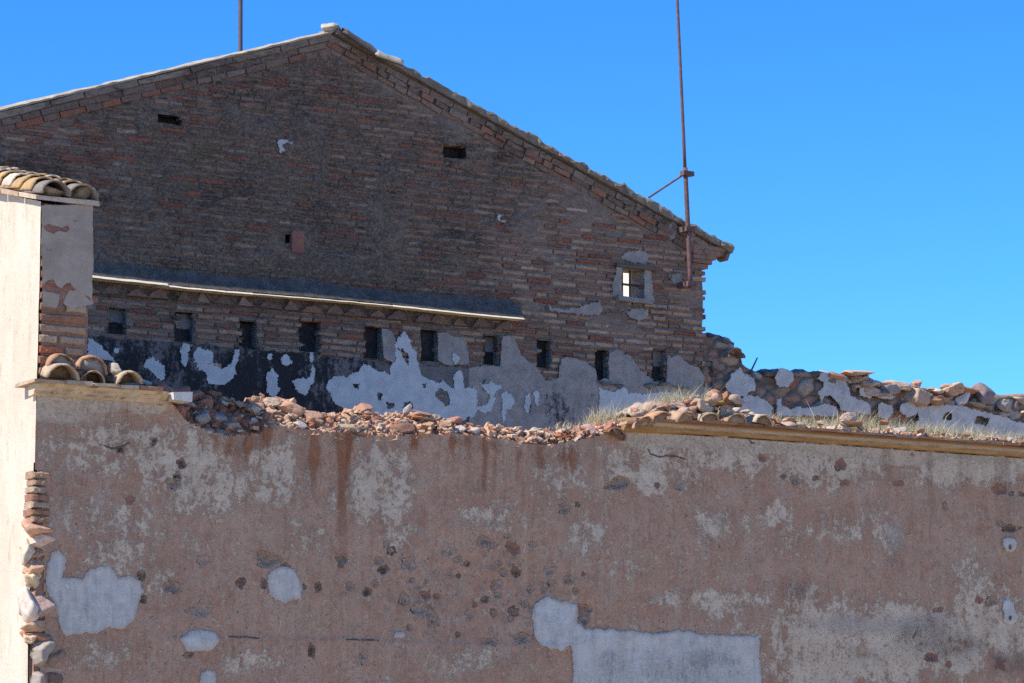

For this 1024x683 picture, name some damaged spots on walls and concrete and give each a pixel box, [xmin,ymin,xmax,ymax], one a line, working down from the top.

flaking render [37,205,119,377]
peeling [144,357,166,381]
peeling [180,342,240,385]
peeling [266,331,539,423]
peeling [598,386,681,418]
spalling [996,520,1022,550]
flaking render [17,471,66,683]